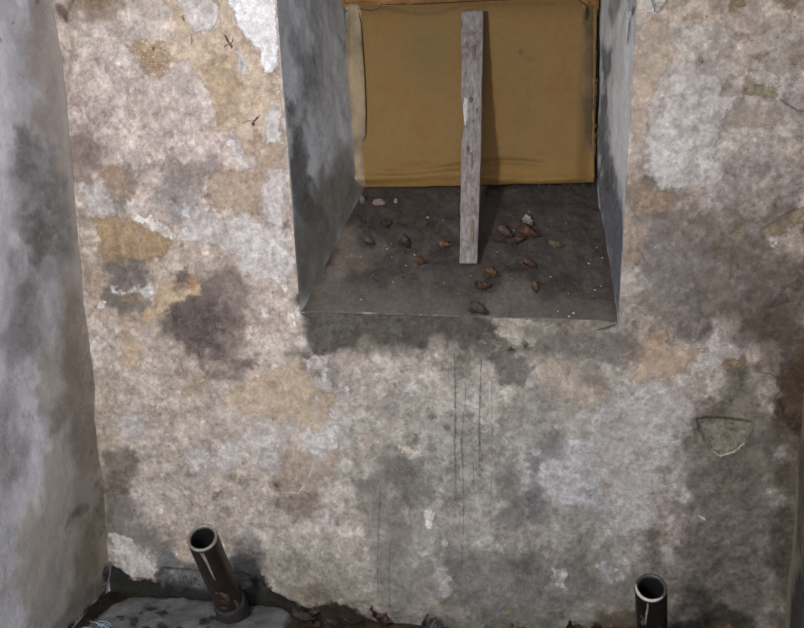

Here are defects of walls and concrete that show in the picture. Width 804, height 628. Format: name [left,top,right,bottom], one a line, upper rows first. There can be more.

peeling [78,0,296,292]
leakage [164,269,251,378]
leakage [298,312,691,542]
spalling [696,417,754,457]
spalling [83,532,213,615]
spalling [228,556,310,612]
leakage [790,444,804,628]